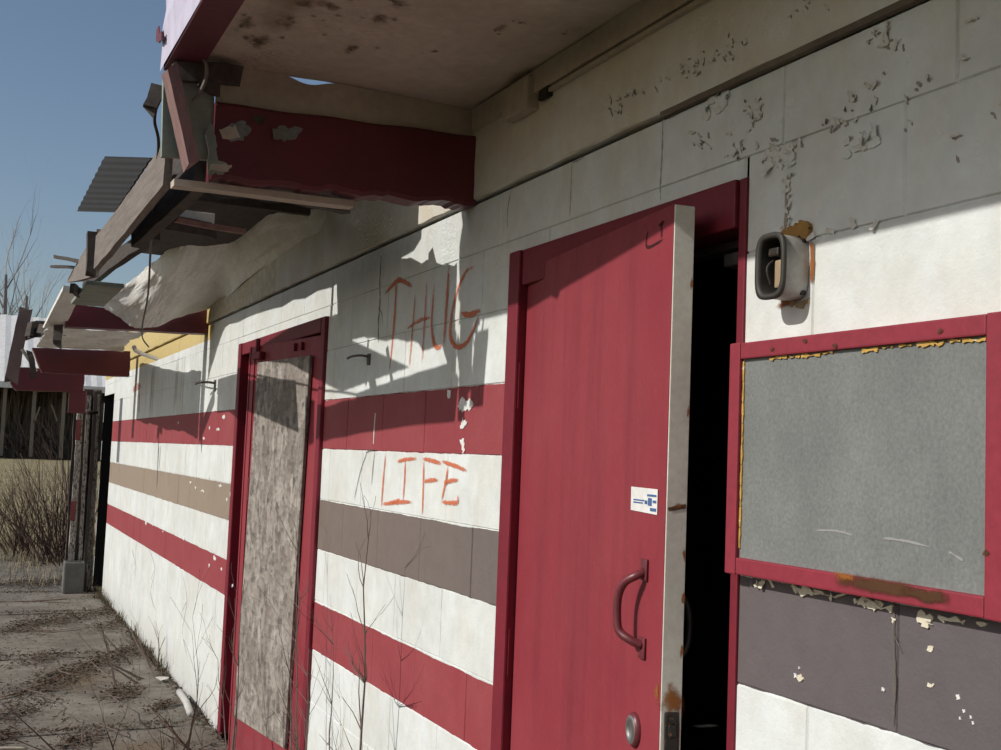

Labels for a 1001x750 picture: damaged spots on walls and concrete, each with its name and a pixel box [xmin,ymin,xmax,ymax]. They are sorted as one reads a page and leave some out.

peeling [603,33,748,117]
peeling [205,114,303,175]
peeling [687,89,730,150]
peeling [725,95,804,164]
peeling [822,71,886,159]
rust [781,220,815,283]
rust [778,297,810,309]
peeling [447,390,473,454]
peeling [791,584,897,623]
rust [835,572,947,603]
peeling [916,609,988,629]
rust [655,685,682,750]